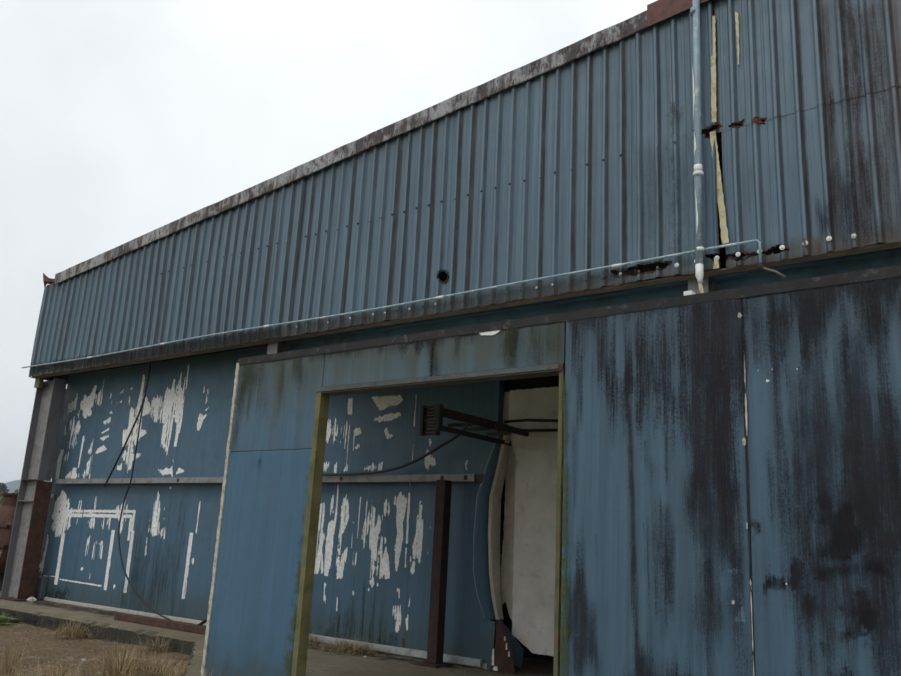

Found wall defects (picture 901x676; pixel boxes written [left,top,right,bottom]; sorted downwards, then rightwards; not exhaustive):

peeling [39,490,136,593]
peeling [55,364,189,489]
peeling [145,491,165,556]
peeling [182,502,200,599]
peeling [197,387,209,431]
peeling [324,398,361,473]
peeling [314,482,431,601]
peeling [372,395,403,439]
peeling [425,439,436,469]
damp [572,277,901,676]
peeling [392,588,410,632]
damp [566,542,598,676]